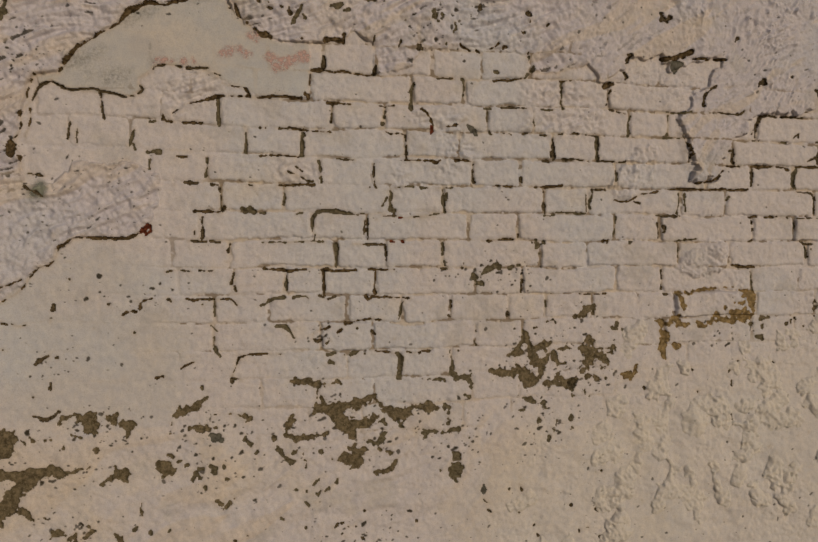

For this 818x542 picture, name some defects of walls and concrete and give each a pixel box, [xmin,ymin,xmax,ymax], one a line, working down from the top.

spalling [256,0,307,25]
spalling [323,32,346,45]
peeling [654,286,770,360]
peeling [488,329,617,424]
peeling [32,410,137,440]
peeling [272,376,461,476]
peeling [0,428,91,529]
peeling [99,465,131,487]
peeling [439,451,464,483]
peeling [49,525,96,542]